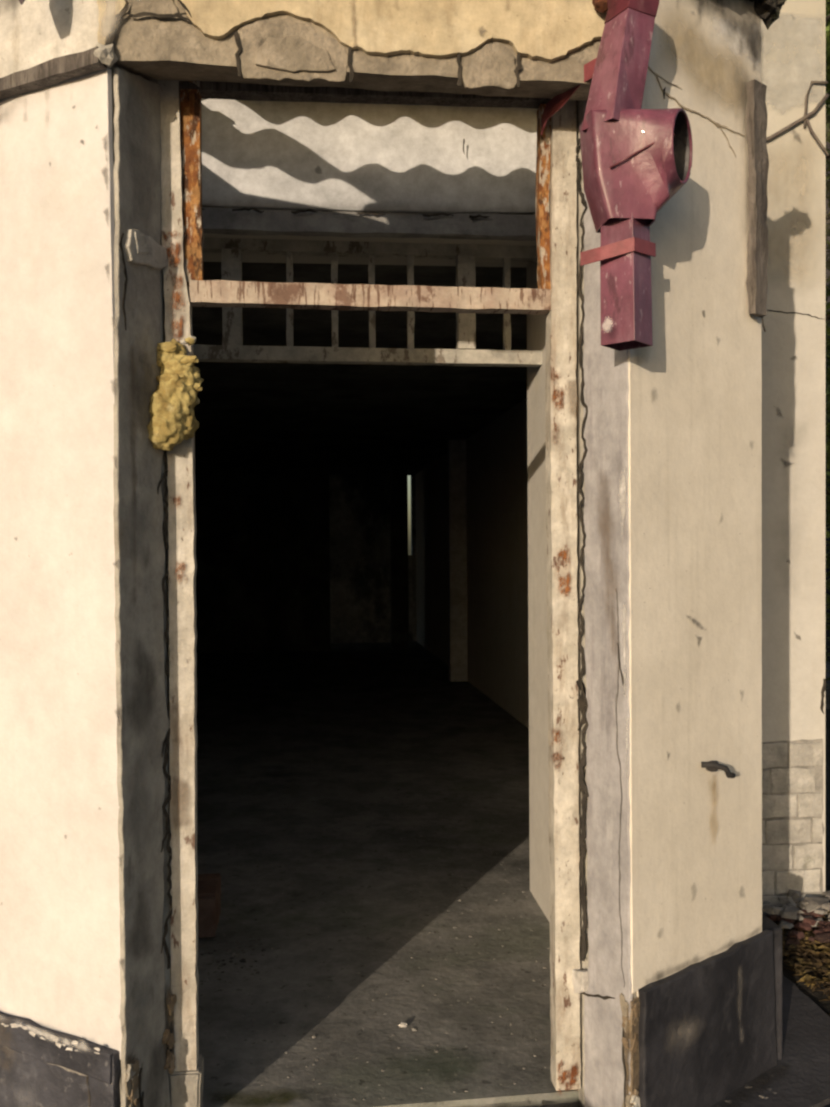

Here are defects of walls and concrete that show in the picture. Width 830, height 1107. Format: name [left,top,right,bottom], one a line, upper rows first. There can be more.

spalling [125,0,178,19]
spalling [237,18,348,83]
crack [648,66,746,157]
rust [552,375,564,408]
rust [557,550,570,596]
crack [158,451,172,969]
spalling [619,993,640,1107]
spalling [125,1056,143,1107]
rust [558,1061,578,1094]